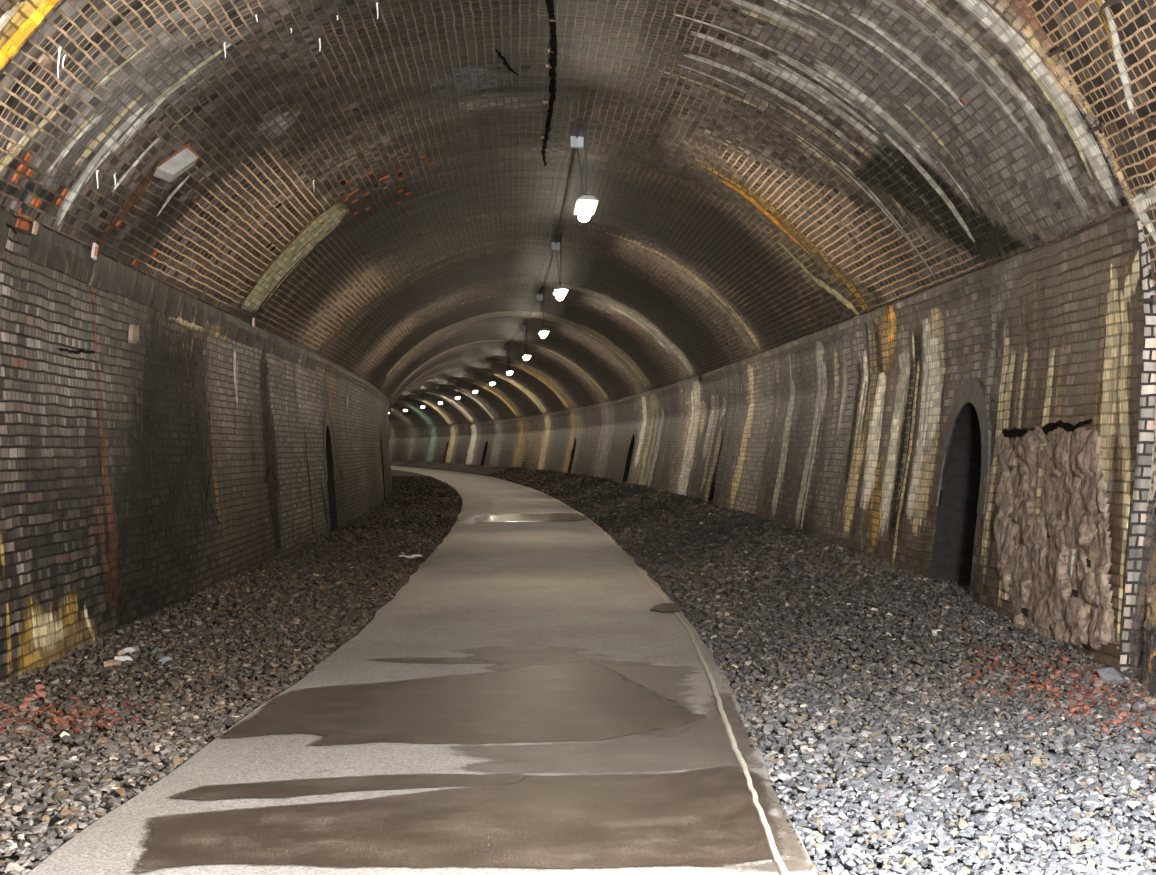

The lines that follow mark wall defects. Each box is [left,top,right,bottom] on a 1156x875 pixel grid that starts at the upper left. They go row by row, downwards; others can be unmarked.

crack [495,49,519,75]
crack [540,0,557,166]
spalling [5,142,69,235]
crack [58,347,95,355]
damp [109,295,280,630]